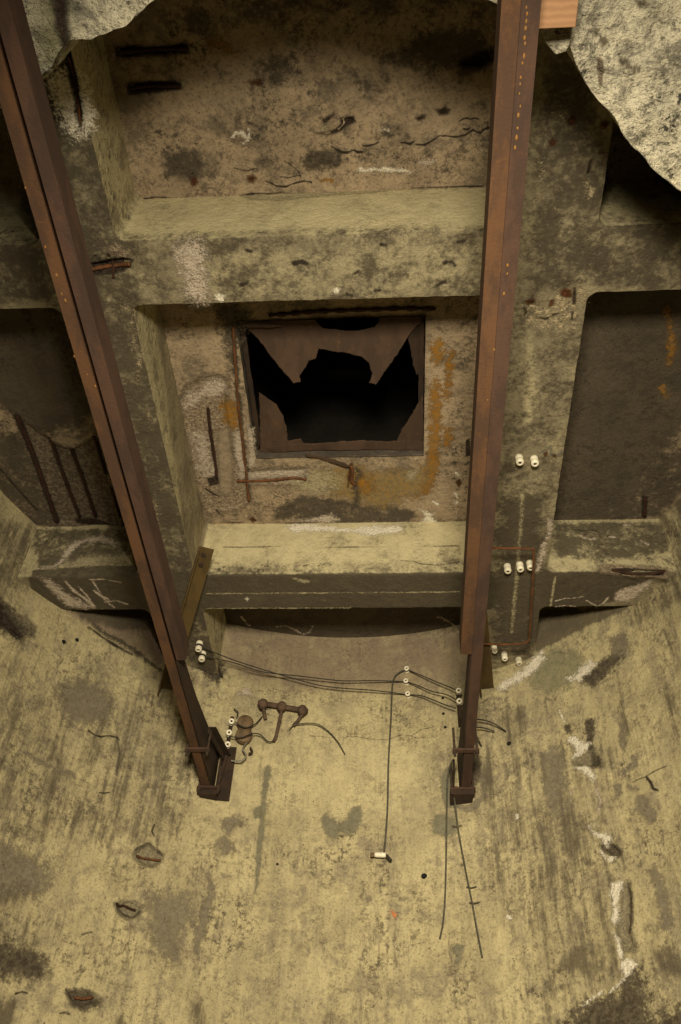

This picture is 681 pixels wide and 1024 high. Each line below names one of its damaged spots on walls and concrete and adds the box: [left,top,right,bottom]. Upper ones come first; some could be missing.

spalling [588,28,608,85]
crack [234,117,489,196]
leakage [171,237,252,374]
spalling [12,411,124,527]
rust [285,337,456,513]
spalling [65,987,102,1012]
spalling [114,900,144,920]
spalling [132,842,165,868]
leakage [253,766,271,892]
leakage [321,807,361,838]
leakage [540,736,616,863]
leakage [557,881,681,1024]